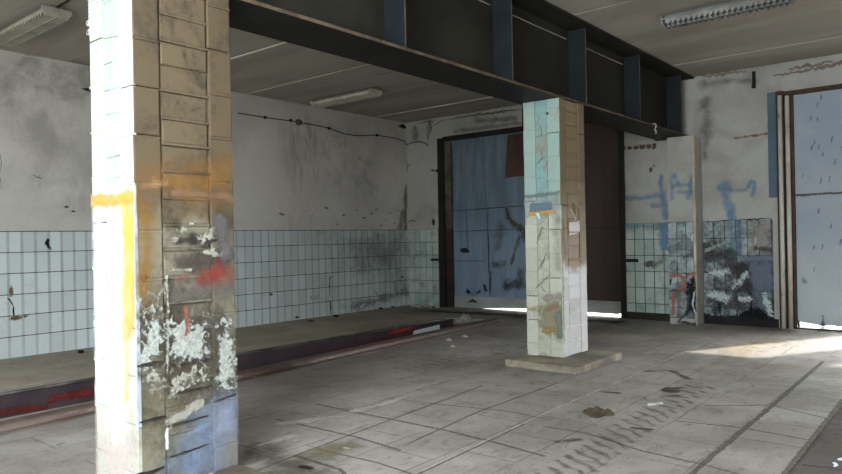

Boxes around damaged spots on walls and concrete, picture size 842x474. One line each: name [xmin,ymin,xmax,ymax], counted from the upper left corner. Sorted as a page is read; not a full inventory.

spalling [773,60,842,77]
peeling [197,228,222,257]
peeling [137,268,461,398]
spalling [0,377,96,419]
peeling [165,399,204,450]